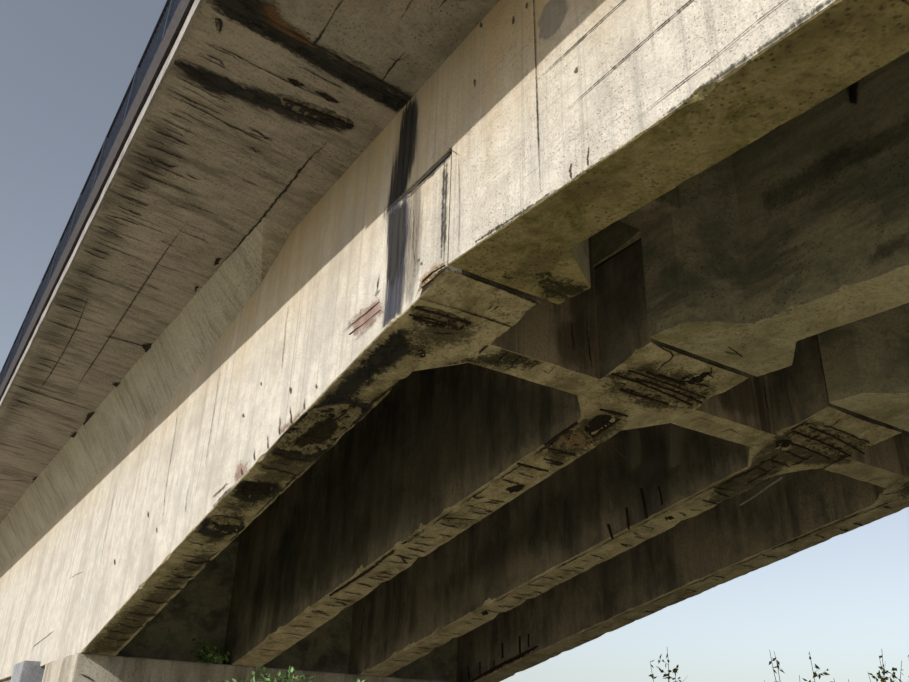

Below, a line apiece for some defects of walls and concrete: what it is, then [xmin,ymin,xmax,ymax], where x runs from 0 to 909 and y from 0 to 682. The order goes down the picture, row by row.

leakage [174,60,350,134]
leakage [207,0,480,430]
spalling [416,262,447,295]
spalling [409,306,471,334]
leakage [531,273,589,301]
leakage [450,350,543,371]
spalling [611,367,714,410]
leakage [201,428,334,549]
spalling [267,394,373,465]
spalling [699,419,873,511]
spalling [84,449,284,654]
spalling [268,409,628,651]